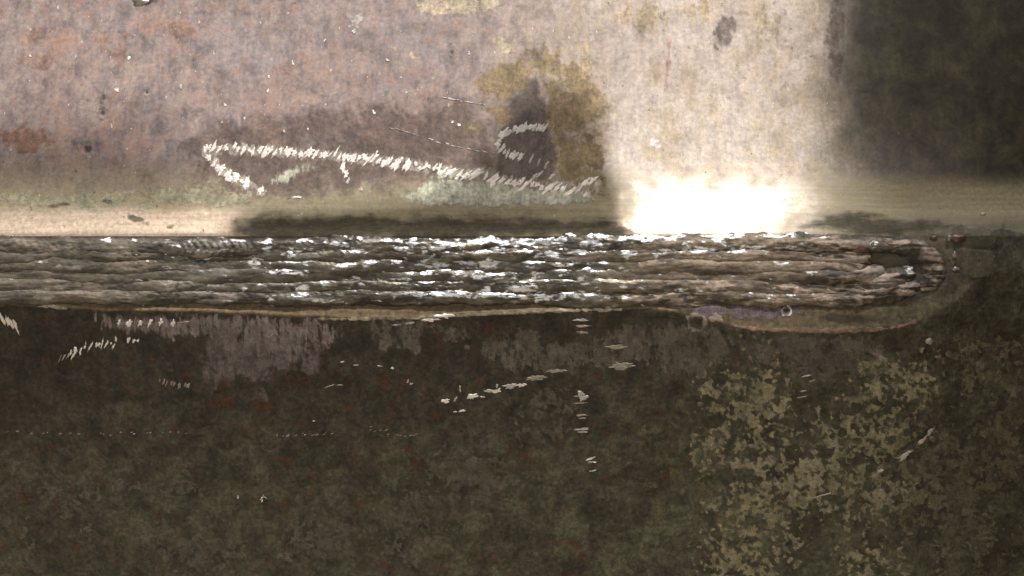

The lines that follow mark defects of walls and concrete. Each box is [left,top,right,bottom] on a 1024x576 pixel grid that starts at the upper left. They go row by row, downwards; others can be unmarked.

damp [619,5,668,32]
damp [184,79,557,200]
damp [639,329,1024,576]